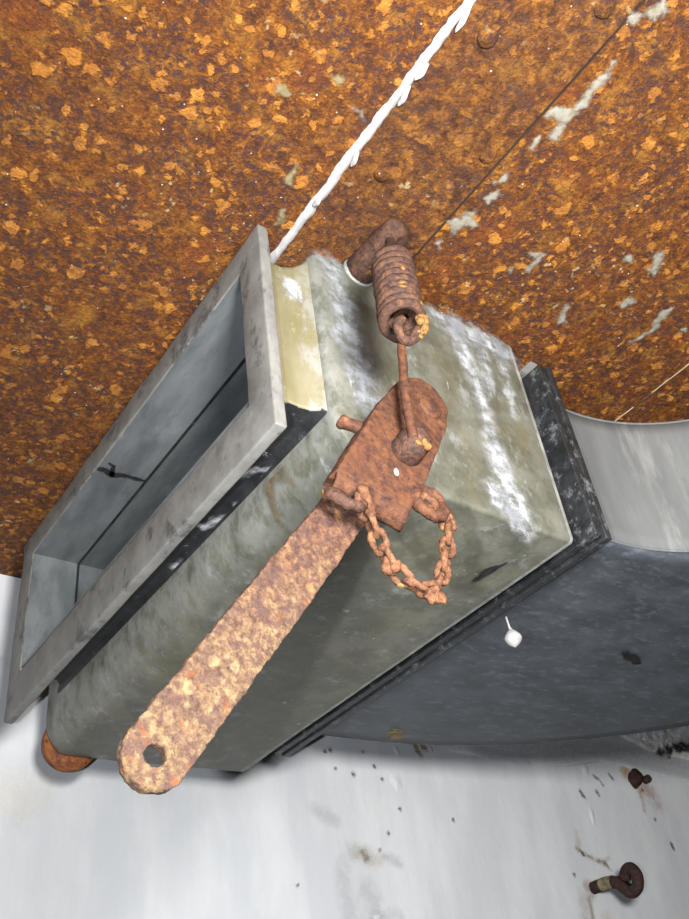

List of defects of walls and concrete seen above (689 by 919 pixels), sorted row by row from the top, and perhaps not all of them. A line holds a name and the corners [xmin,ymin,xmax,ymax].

peeling [455,2,473,33]
peeling [628,0,668,25]
peeling [529,61,616,149]
peeling [484,174,508,204]
peeling [447,212,478,233]
peeling [526,252,545,273]
peeling [648,251,664,275]
peeling [629,307,673,342]